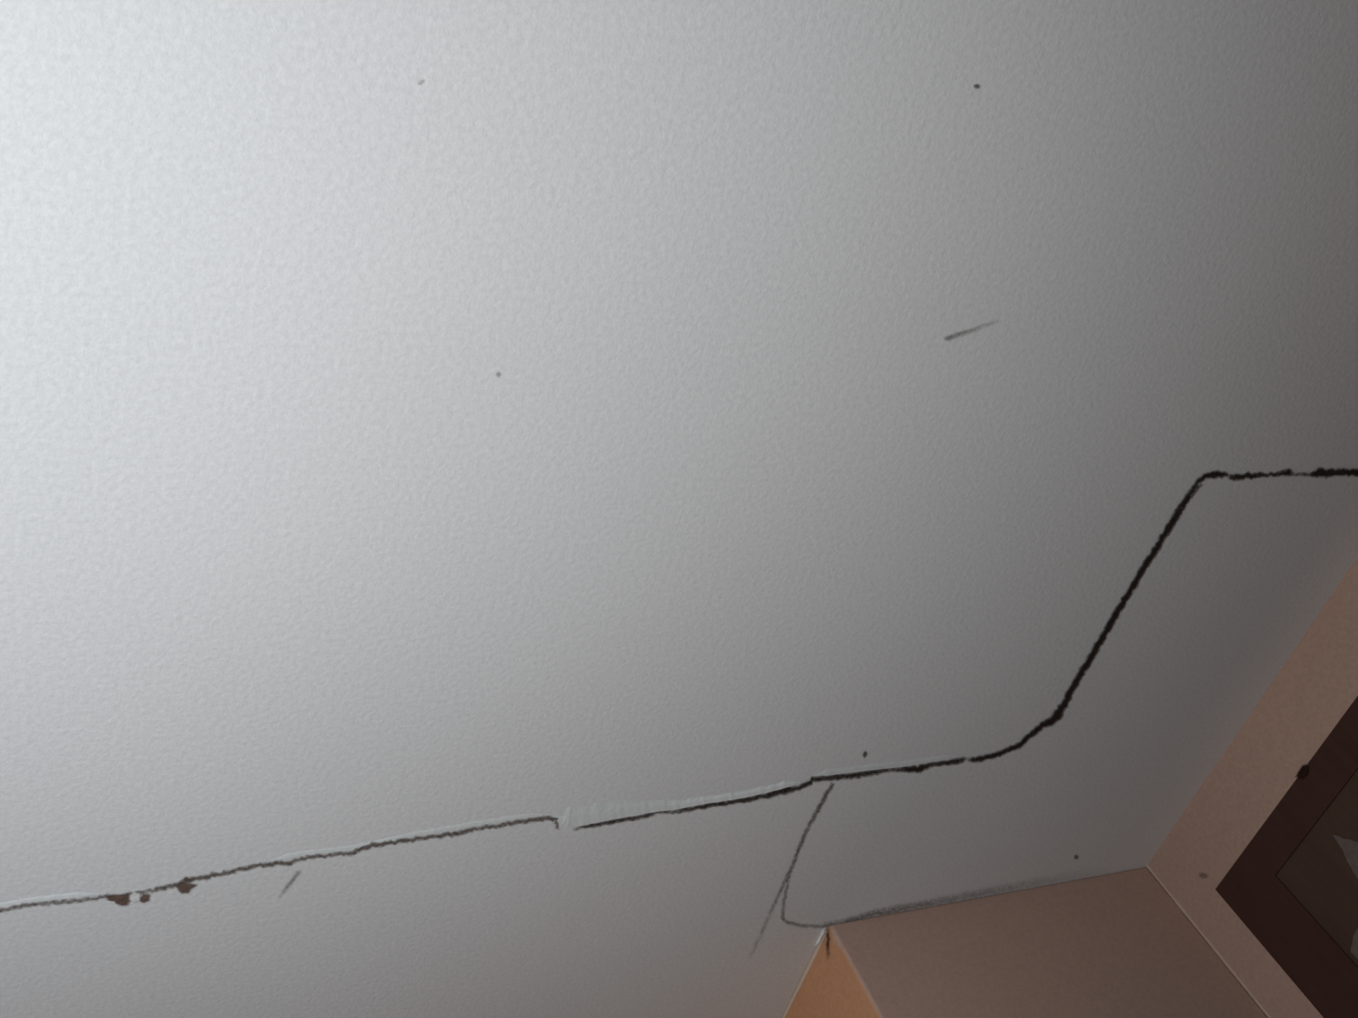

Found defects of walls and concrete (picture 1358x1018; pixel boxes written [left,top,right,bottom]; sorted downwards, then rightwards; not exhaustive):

crack [0,468,1358,953]